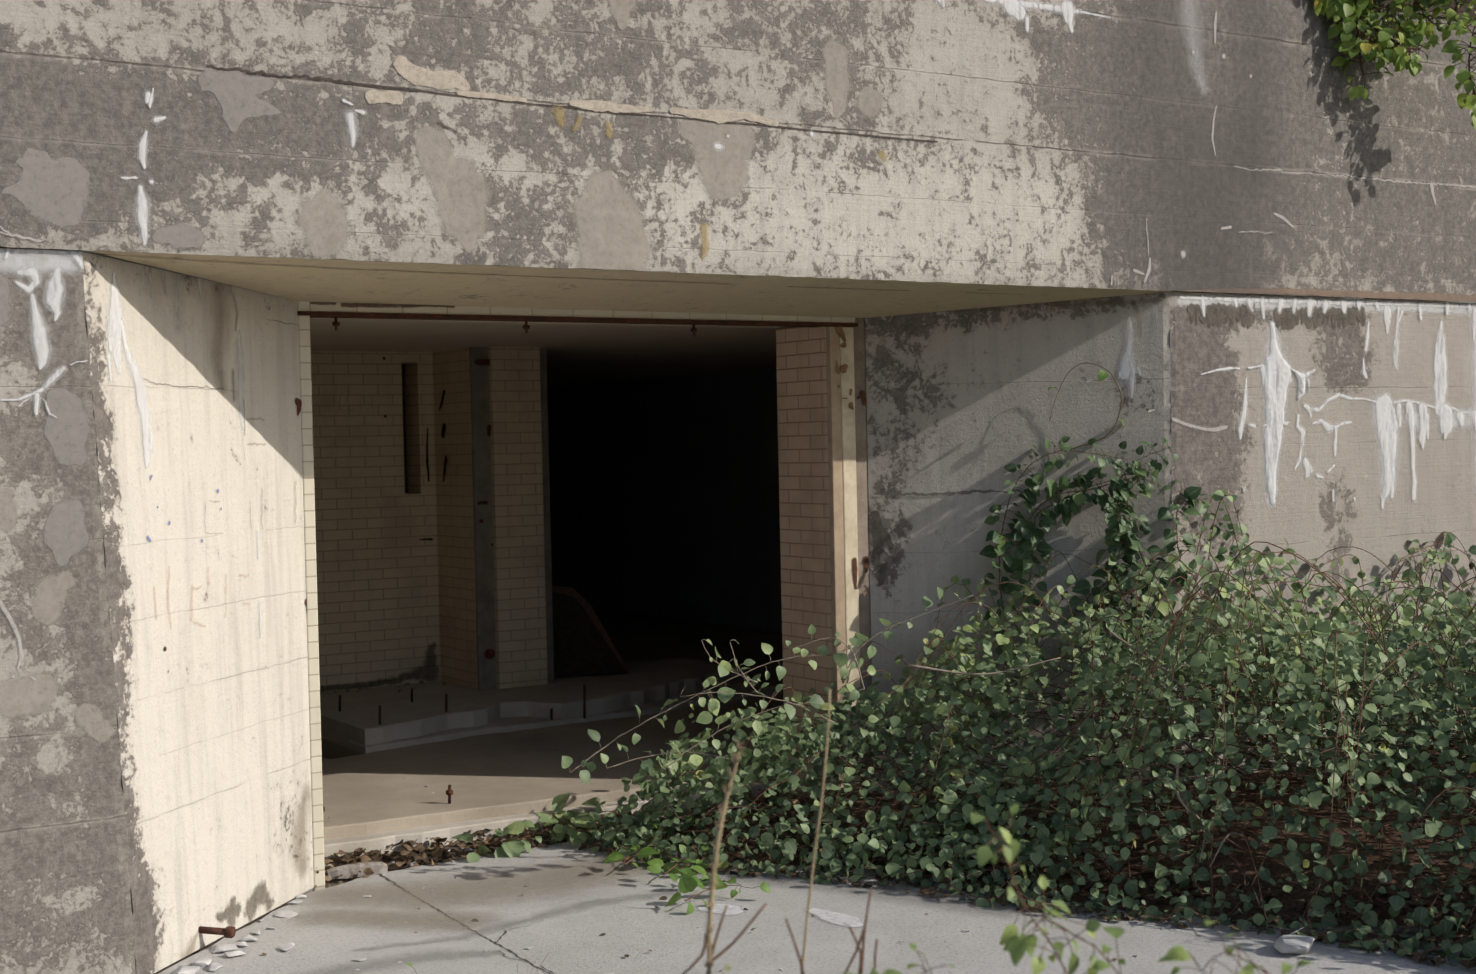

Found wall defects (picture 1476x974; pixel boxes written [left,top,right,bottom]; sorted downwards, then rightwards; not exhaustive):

water stain [985,0,1111,32]
crack [206,65,938,142]
water stain [121,88,166,245]
water stain [1133,219,1151,283]
water stain [1221,212,1294,234]
water stain [1234,166,1476,205]
water stain [0,248,84,370]
water stain [1178,288,1476,505]
corrosion [852,556,869,589]
water stain [870,511,893,587]
crack [380,874,554,974]